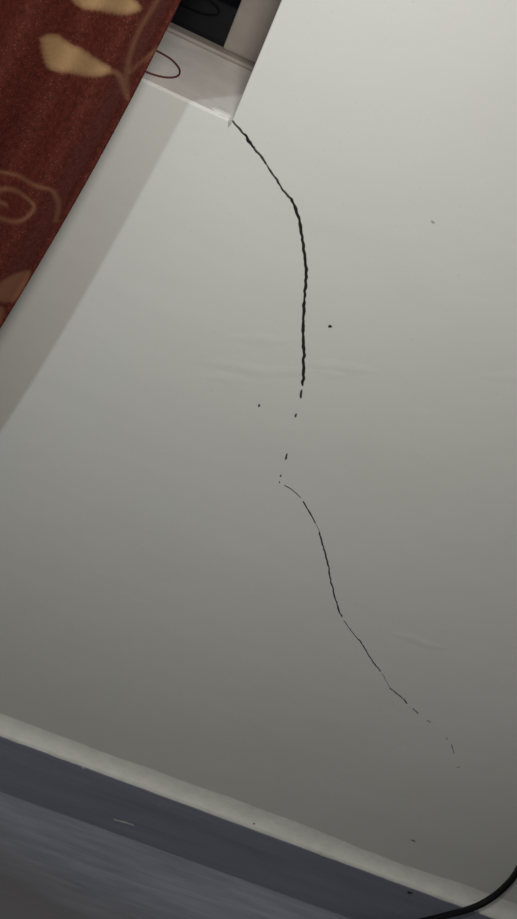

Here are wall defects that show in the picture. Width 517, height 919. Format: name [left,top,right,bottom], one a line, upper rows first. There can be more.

crack [232,120,308,417]
crack [279,454,431,723]